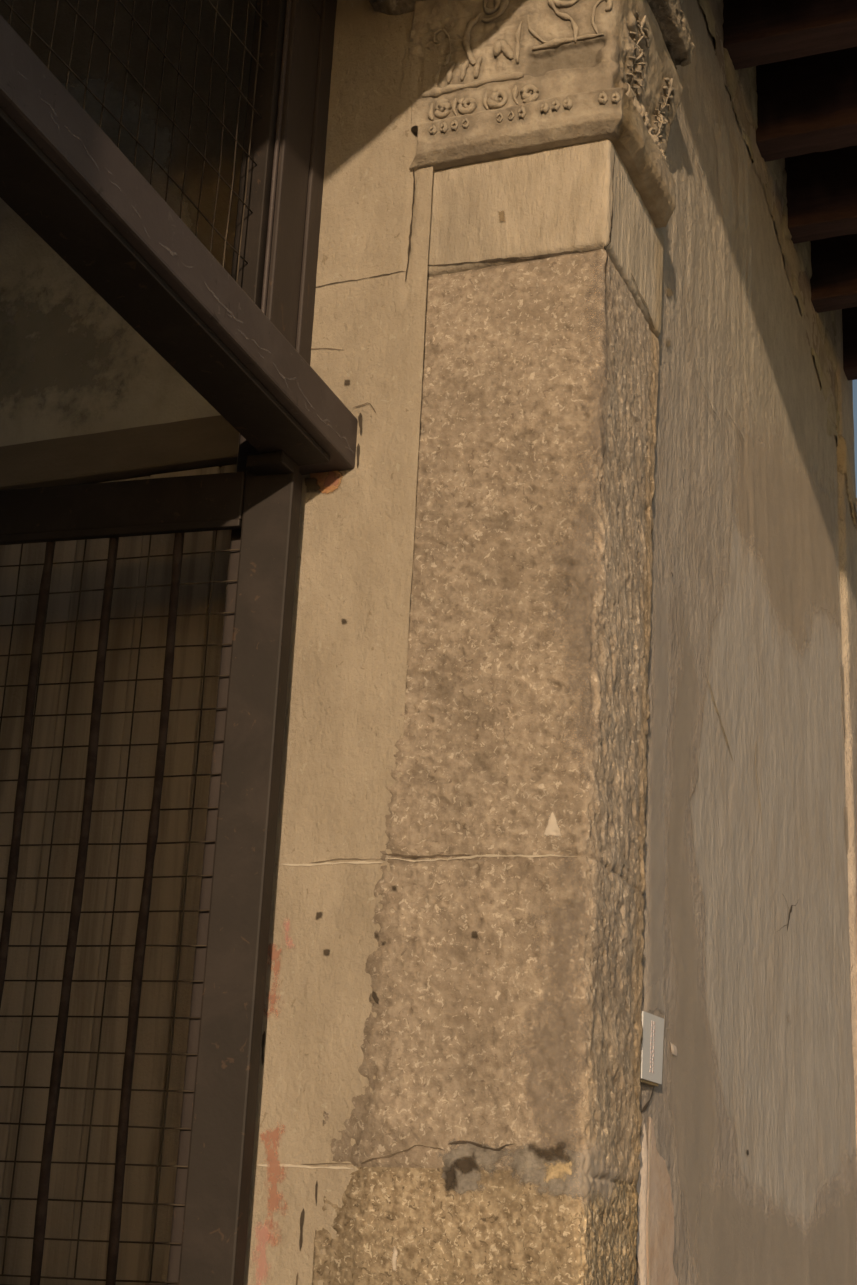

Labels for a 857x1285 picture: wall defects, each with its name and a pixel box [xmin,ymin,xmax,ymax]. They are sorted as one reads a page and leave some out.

crack [283,853,577,866]
flaking render [690,523,857,1221]
flaking render [636,1087,679,1285]